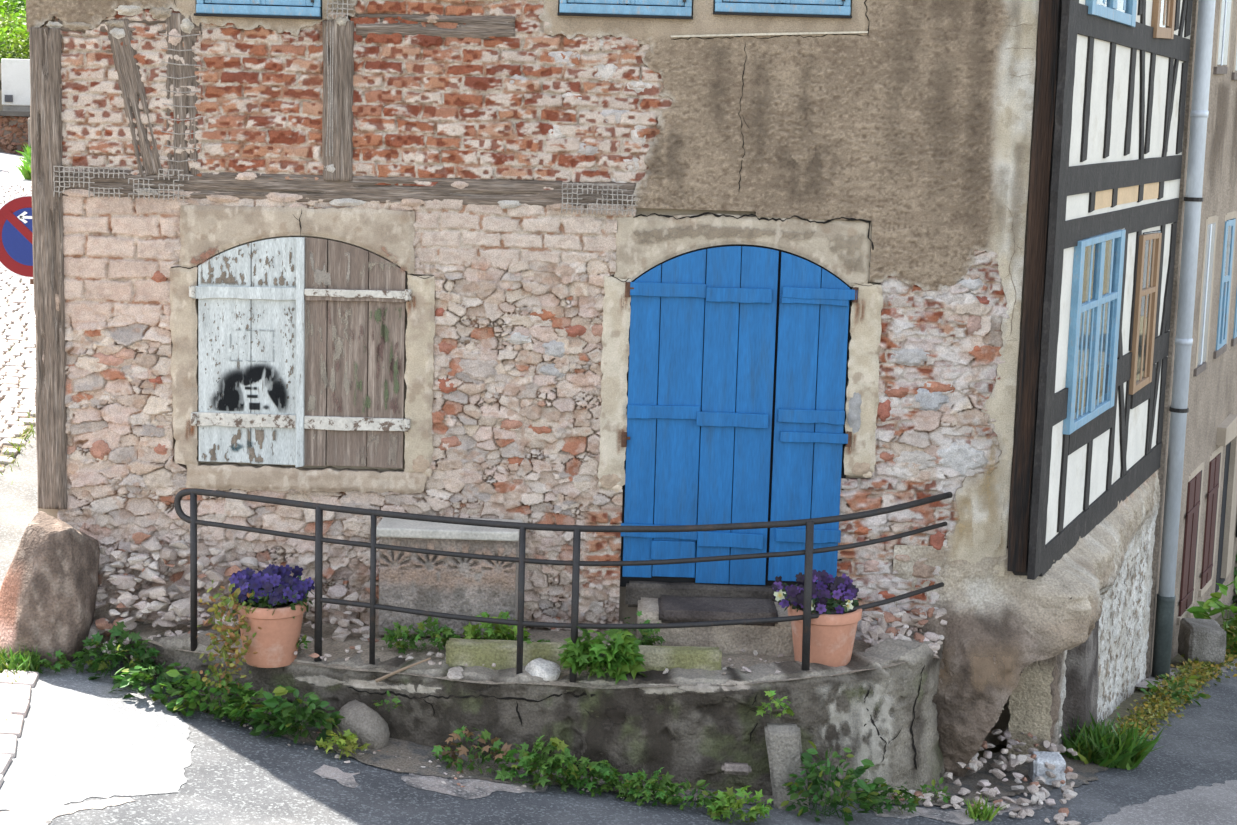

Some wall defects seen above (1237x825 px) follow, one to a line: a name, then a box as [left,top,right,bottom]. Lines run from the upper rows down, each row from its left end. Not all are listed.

crack [633,0,874,250]
flaking render [46,0,673,649]
flaking render [837,250,1010,641]
crack [858,666,925,770]